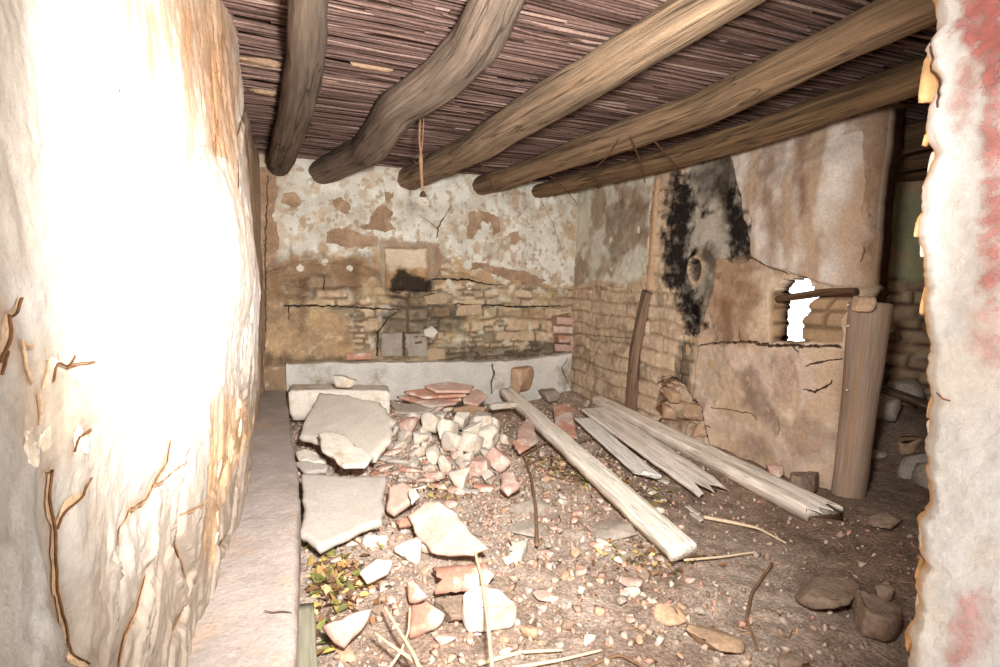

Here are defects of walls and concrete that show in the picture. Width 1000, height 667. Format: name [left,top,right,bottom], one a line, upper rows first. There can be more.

leakage [723,182,752,260]
spalling [260,166,707,438]
crack [432,278,561,317]
crack [0,297,97,425]
crack [43,469,93,667]
crack [74,427,93,452]
crack [118,575,146,667]
crack [117,440,188,546]
crack [174,449,229,580]
crack [658,330,843,445]